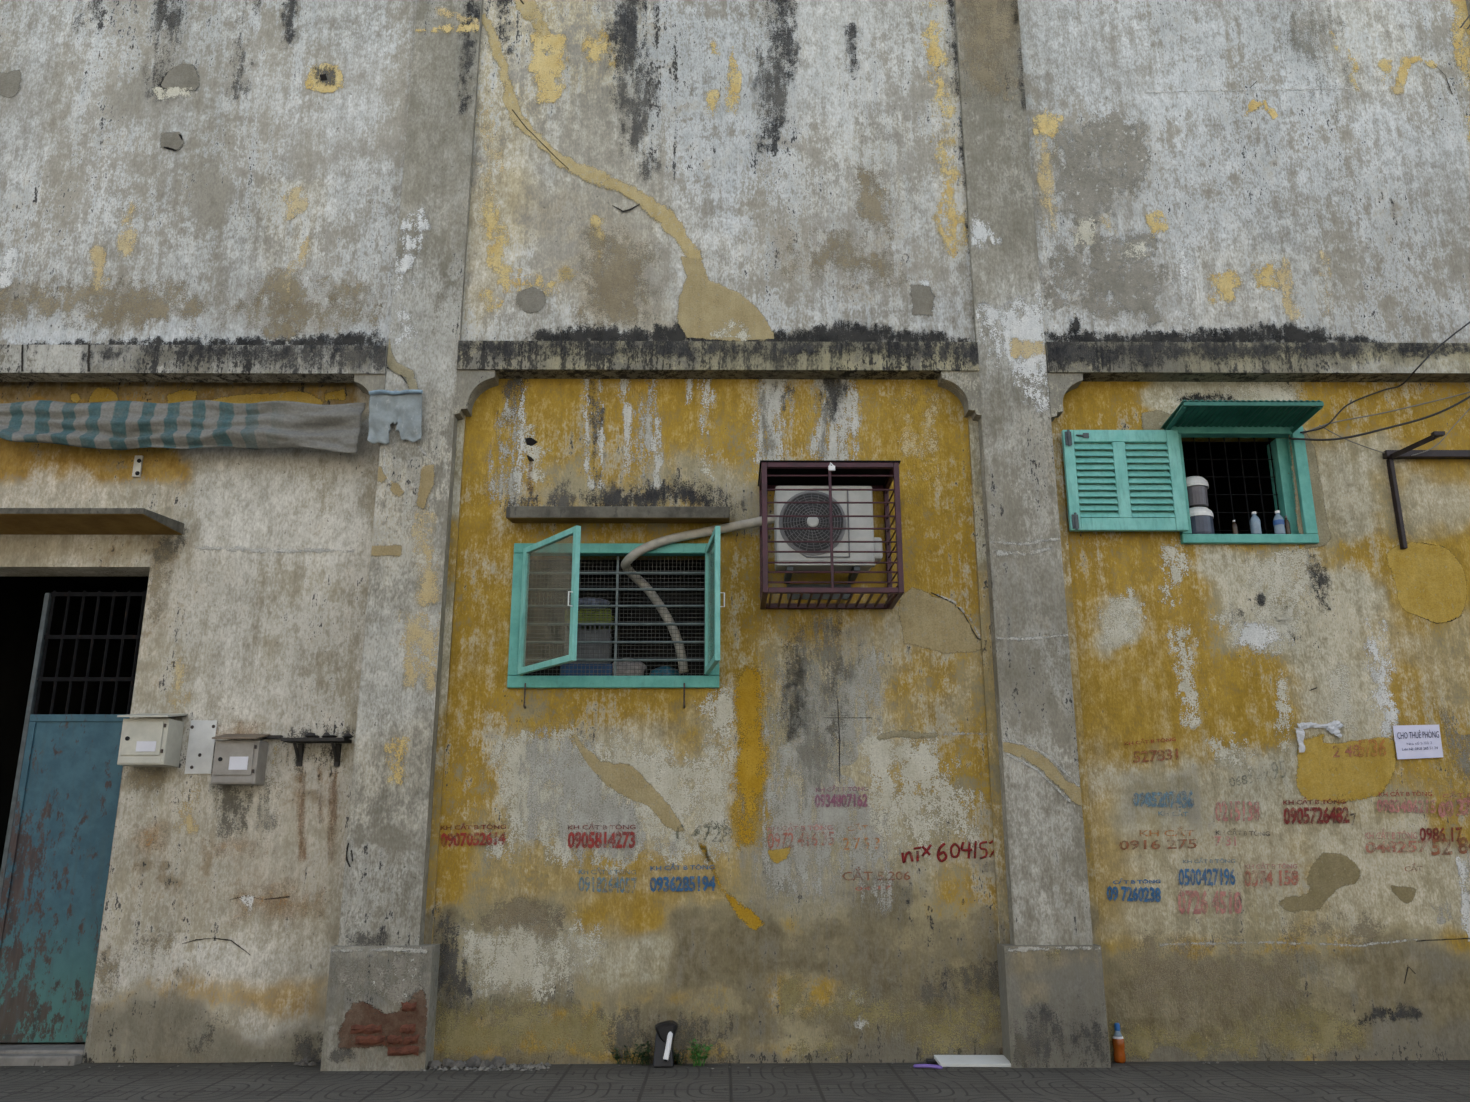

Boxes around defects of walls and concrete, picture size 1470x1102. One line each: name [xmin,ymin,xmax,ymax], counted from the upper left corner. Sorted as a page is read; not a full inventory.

spalling [305,63,344,93]
damp [605,0,660,180]
peeling [706,41,742,119]
peeling [475,110,578,317]
damp [0,267,387,371]
damp [458,226,979,366]
damp [1044,243,1470,368]
damp [487,379,744,516]
damp [752,379,862,474]
corrosion [294,746,341,858]
peeling [484,644,985,911]
spalling [329,952,428,1056]